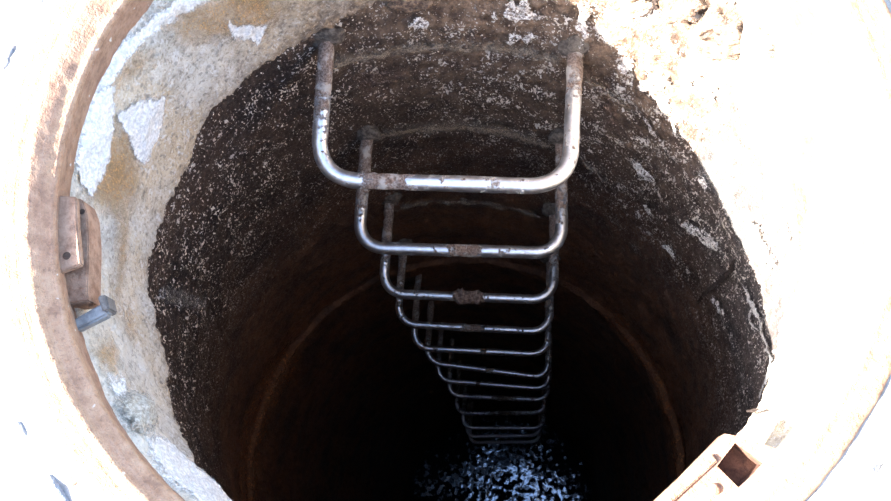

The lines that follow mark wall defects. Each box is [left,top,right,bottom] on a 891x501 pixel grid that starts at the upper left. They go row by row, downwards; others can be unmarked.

spalling [386,0,437,13]
leakage [408,17,429,29]
efflorescence [492,0,541,45]
efflorescence [575,2,591,50]
spalling [664,0,741,61]
efflorescence [617,58,633,74]
efflorescence [638,70,720,107]
crack [697,259,772,414]